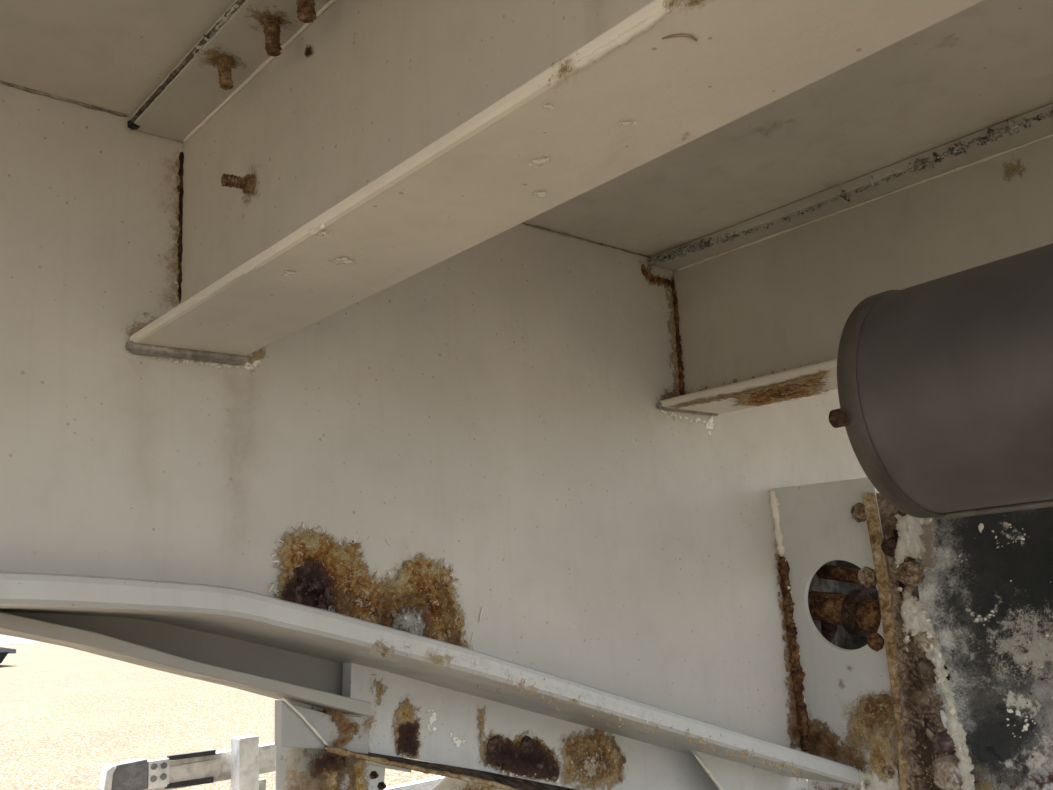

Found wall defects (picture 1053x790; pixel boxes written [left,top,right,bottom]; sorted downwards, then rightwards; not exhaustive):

rust [663,0,703,8]
rust [670,370,828,408]
rust [268,524,474,669]
rust [775,529,993,790]
rust [288,674,388,790]
rust [392,698,420,759]
rust [477,703,859,790]